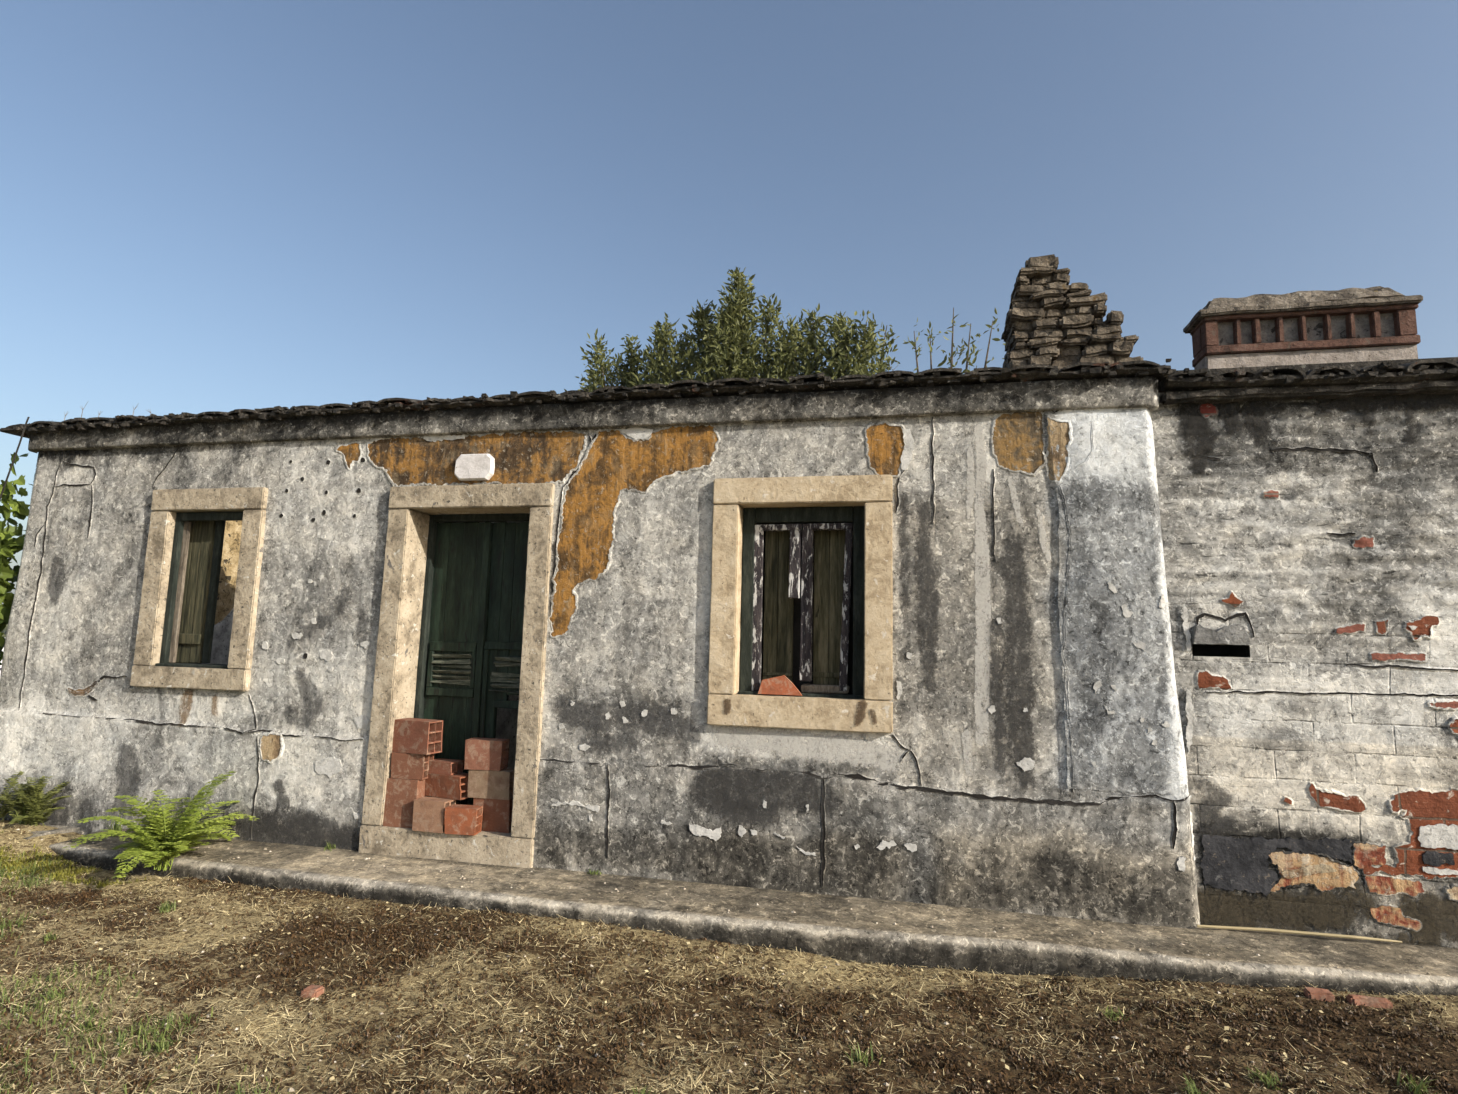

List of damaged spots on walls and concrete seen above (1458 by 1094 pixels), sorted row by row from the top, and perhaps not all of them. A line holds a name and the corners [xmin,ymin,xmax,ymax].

flaking render [863,421,914,478]
flaking render [990,412,1073,483]
flaking render [326,425,721,639]
crack [19,460,363,840]
crack [540,410,1191,887]
water stain [962,424,1052,790]
peeling [1159,595,1191,651]
flaking render [1334,614,1441,664]
water stain [551,698,902,827]
flaking render [1177,787,1458,932]
flaking render [1281,782,1368,814]
flaking render [1425,699,1458,738]